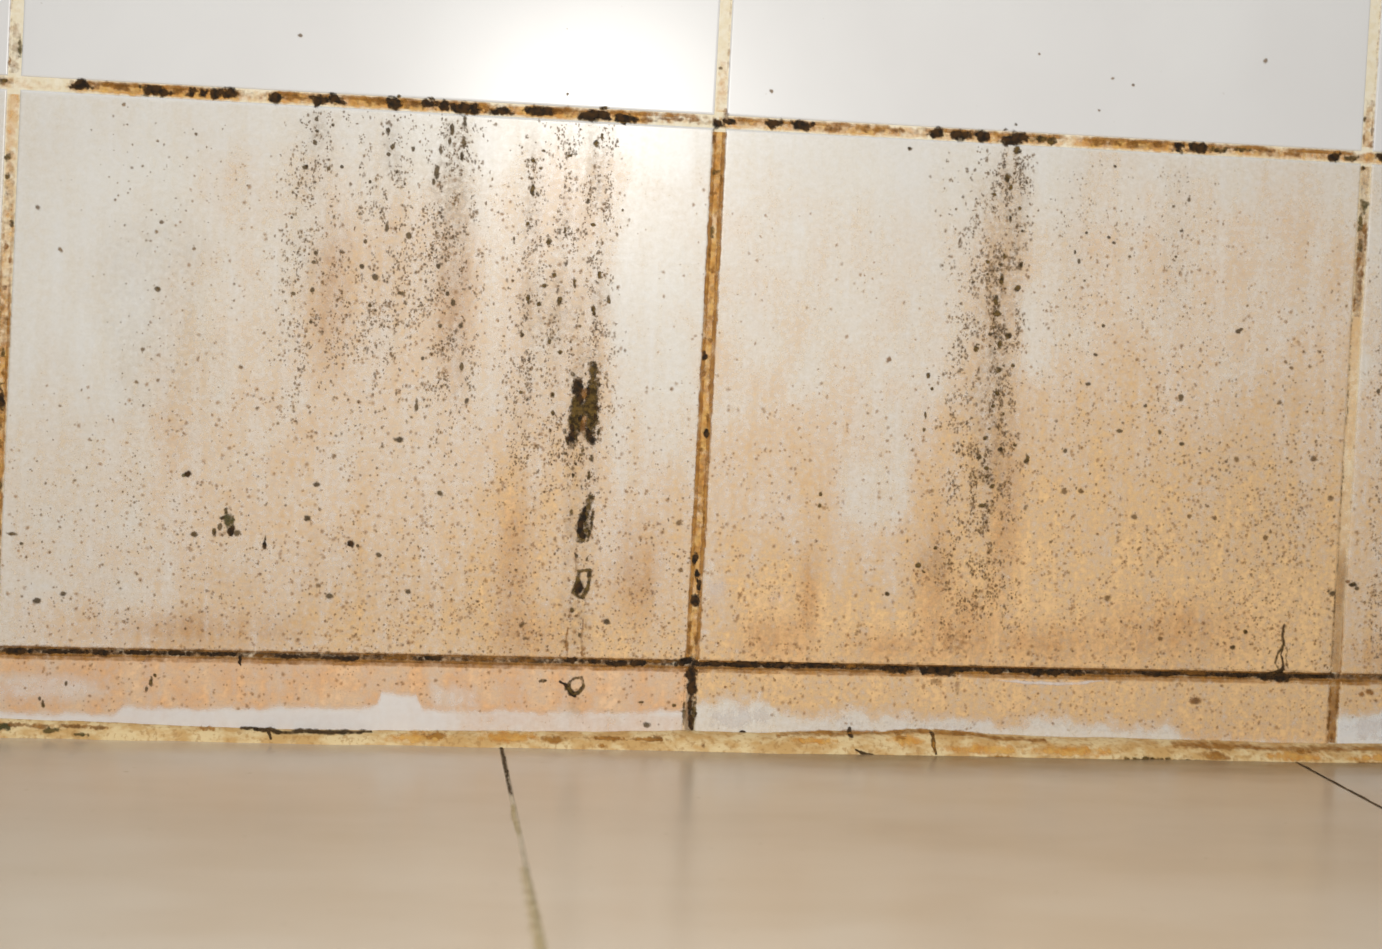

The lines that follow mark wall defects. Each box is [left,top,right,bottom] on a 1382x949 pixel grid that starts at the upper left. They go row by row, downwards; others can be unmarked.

damp [69,78,238,106]
damp [0,92,1382,743]